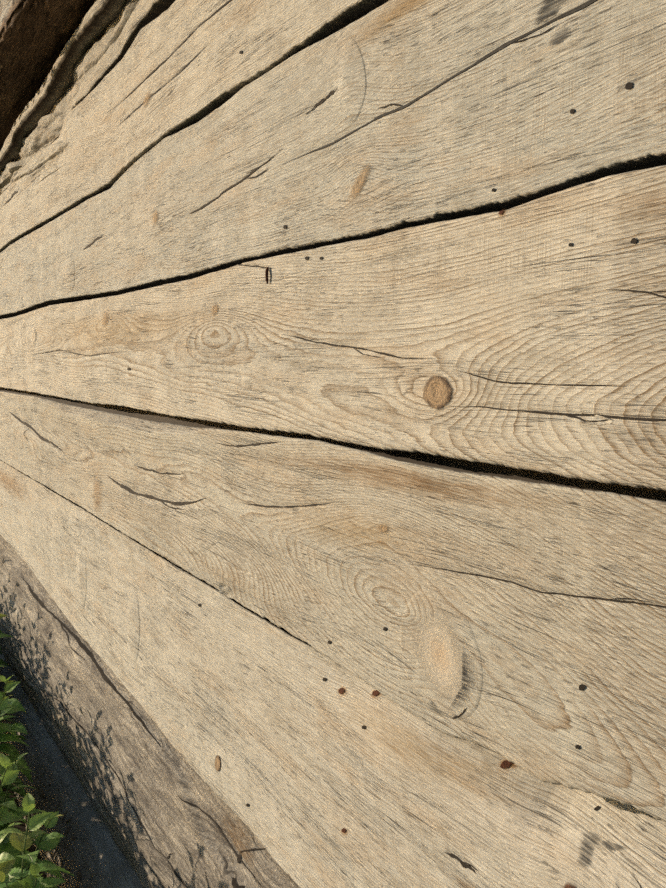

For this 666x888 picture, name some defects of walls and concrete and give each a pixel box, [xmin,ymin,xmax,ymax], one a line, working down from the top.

crack [190,0,596,214]
crack [606,289,666,299]
crack [453,369,612,386]
crack [453,406,666,422]
crack [11,413,63,452]
crack [136,466,183,475]
crack [108,476,205,510]
crack [22,578,161,747]
crack [179,797,266,888]